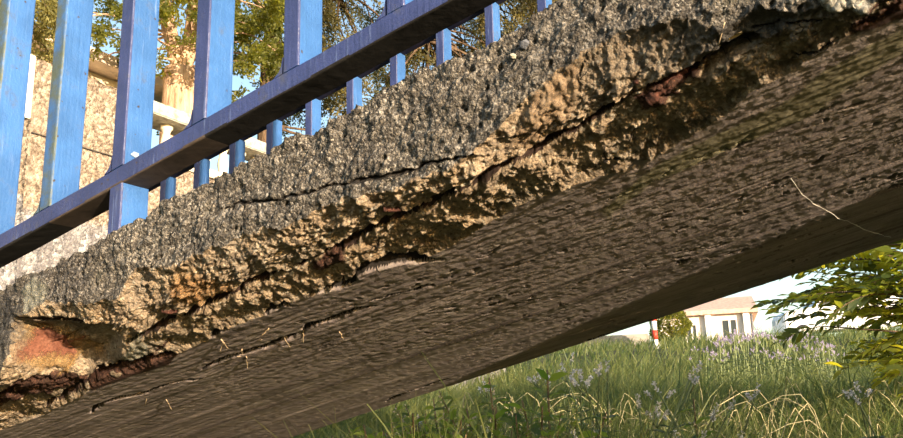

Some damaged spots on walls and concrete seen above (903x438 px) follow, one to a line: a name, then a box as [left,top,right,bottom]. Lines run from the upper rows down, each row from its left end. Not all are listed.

spalling [422,0,866,226]
crack [18,316,104,324]
rust [0,323,178,406]
spalling [0,176,484,430]
crack [45,83,649,412]